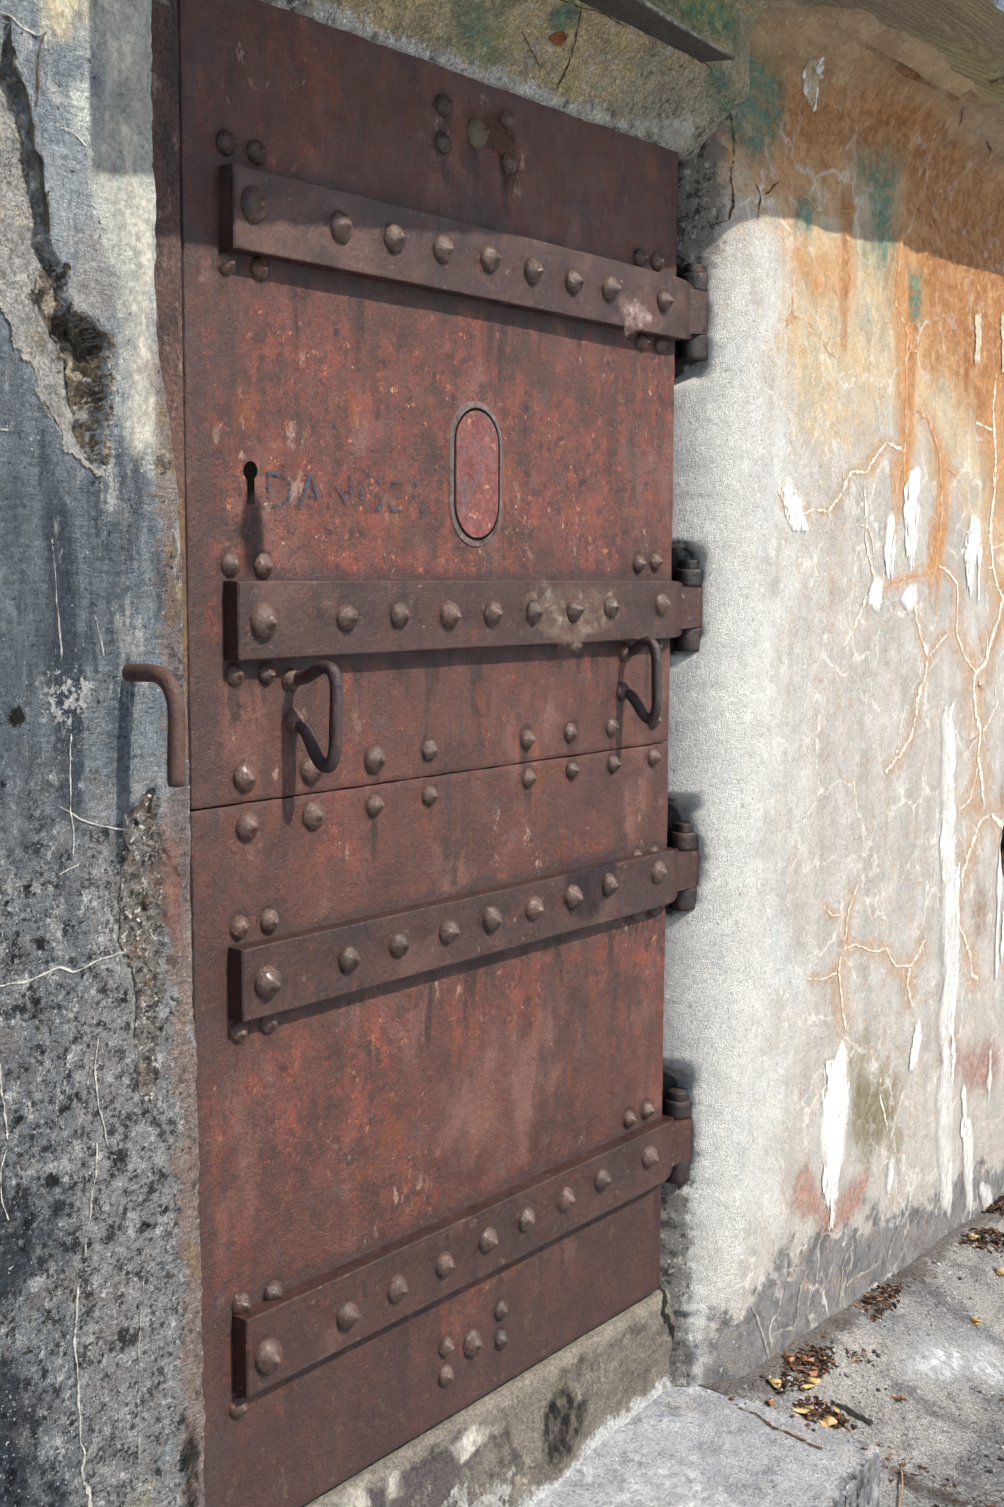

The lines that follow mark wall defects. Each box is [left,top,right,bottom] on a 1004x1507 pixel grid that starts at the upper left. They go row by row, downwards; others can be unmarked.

rust [550,31,568,47]
leakage [633,114,694,140]
leakage [711,58,783,152]
leakage [802,57,824,112]
spalling [0,56,118,477]
rust [859,88,1004,511]
crack [778,231,1004,1038]
crack [0,952,129,987]
crack [0,1064,9,1220]
leakage [821,1043,850,1230]
crack [73,1035,108,1507]